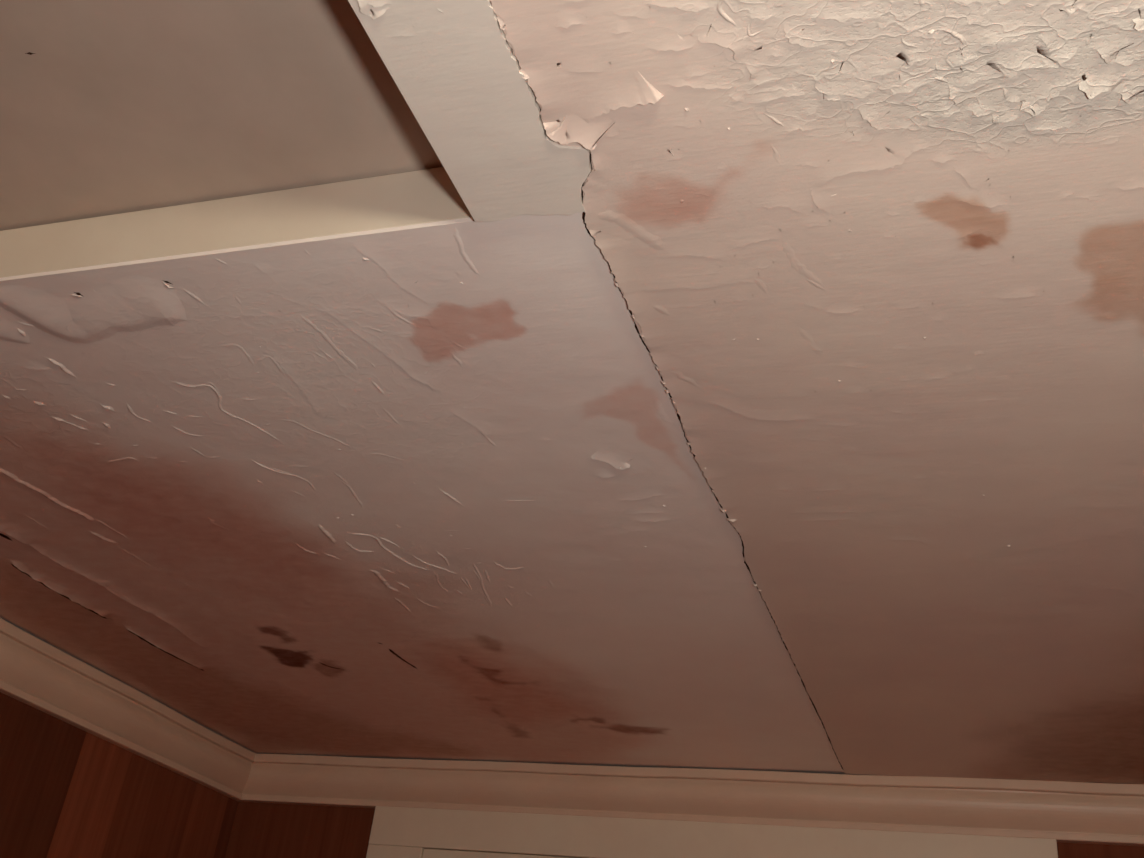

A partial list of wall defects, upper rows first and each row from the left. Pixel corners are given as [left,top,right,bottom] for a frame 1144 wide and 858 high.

peeling [574,71,663,123]
peeling [640,0,718,12]
peeling [698,0,1144,154]
crack [490,0,843,769]
peeling [0,468,151,567]
peeling [0,499,215,670]